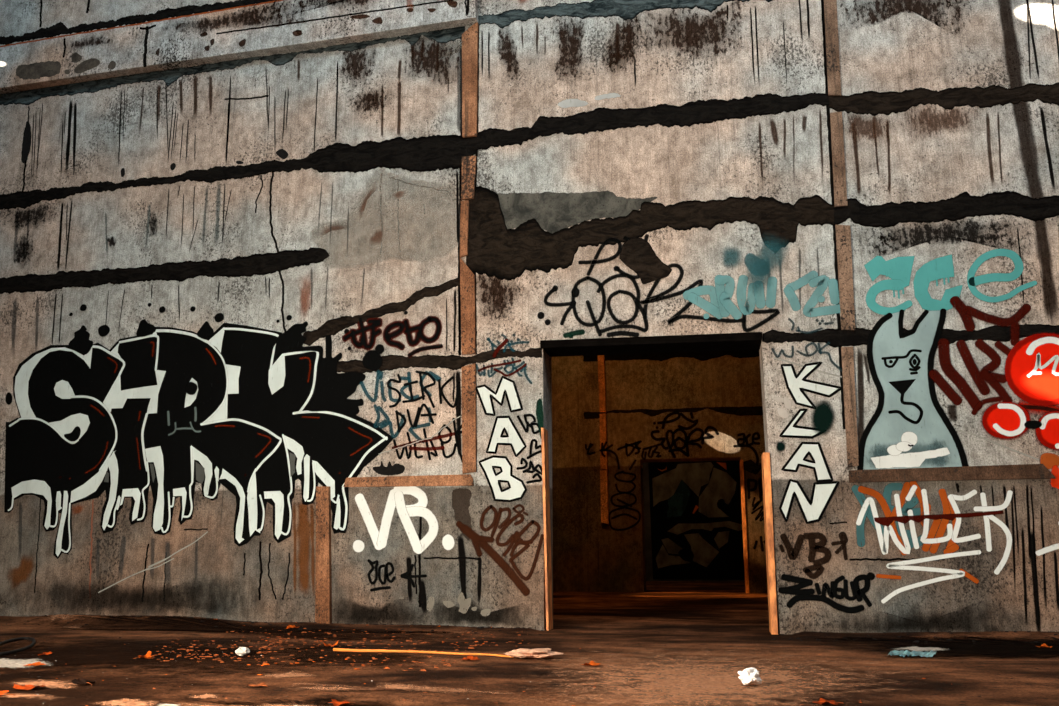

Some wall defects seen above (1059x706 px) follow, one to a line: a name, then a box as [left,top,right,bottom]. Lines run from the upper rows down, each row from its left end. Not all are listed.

damp [481,27,523,84]
damp [536,16,586,81]
damp [602,1,759,85]
damp [798,0,826,74]
damp [1051,0,1059,60]
crack [216,0,480,355]
crack [821,0,845,429]